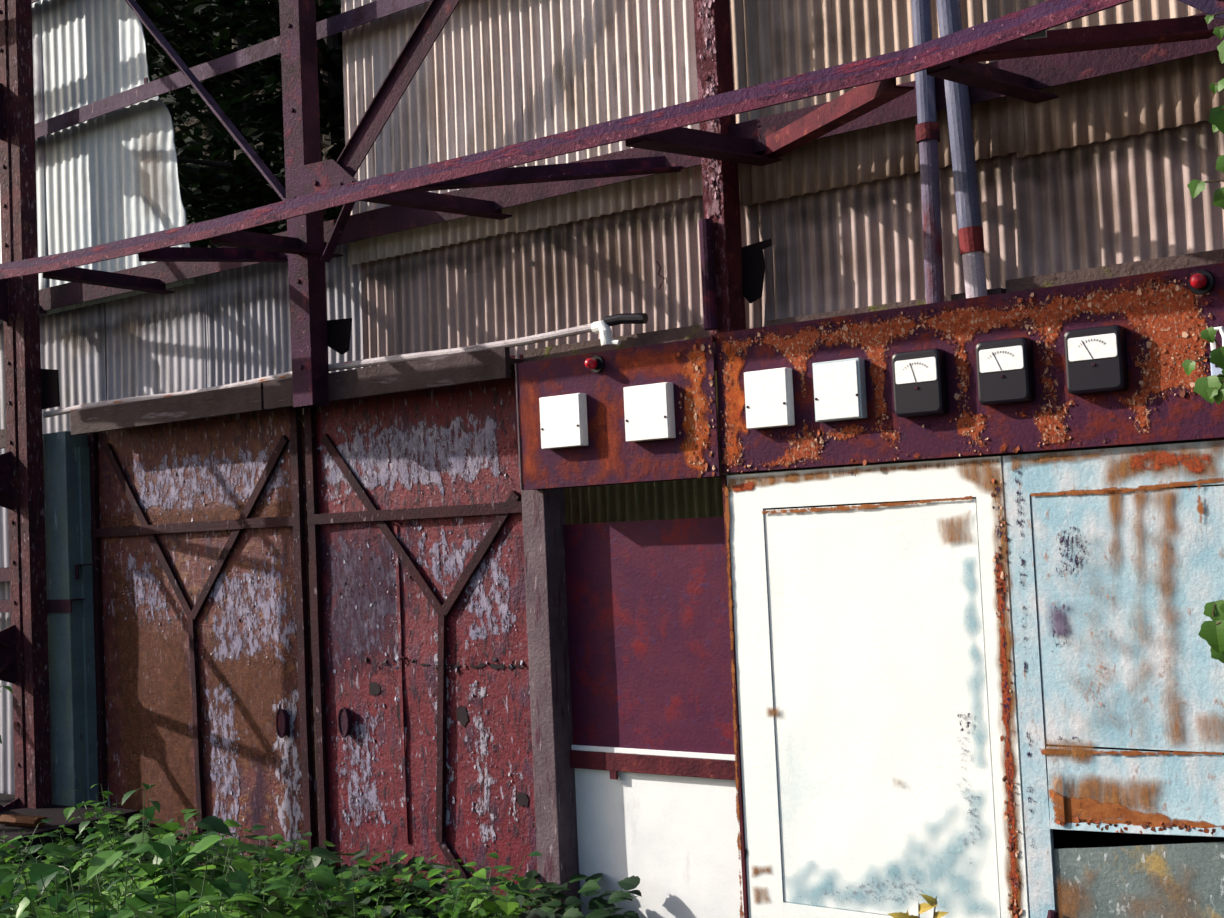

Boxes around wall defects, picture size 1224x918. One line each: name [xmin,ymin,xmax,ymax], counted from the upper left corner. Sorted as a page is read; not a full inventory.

peeling [126,435,290,525]
peeling [318,402,511,504]
rust [522,385,538,475]
peeling [117,548,178,635]
peeling [322,523,517,674]
rust [617,272,1224,918]
rust [207,641,292,768]
peeling [204,551,298,856]
peeling [271,689,304,874]
peeling [332,680,409,834]
peeling [430,628,455,827]
peeling [468,680,519,846]